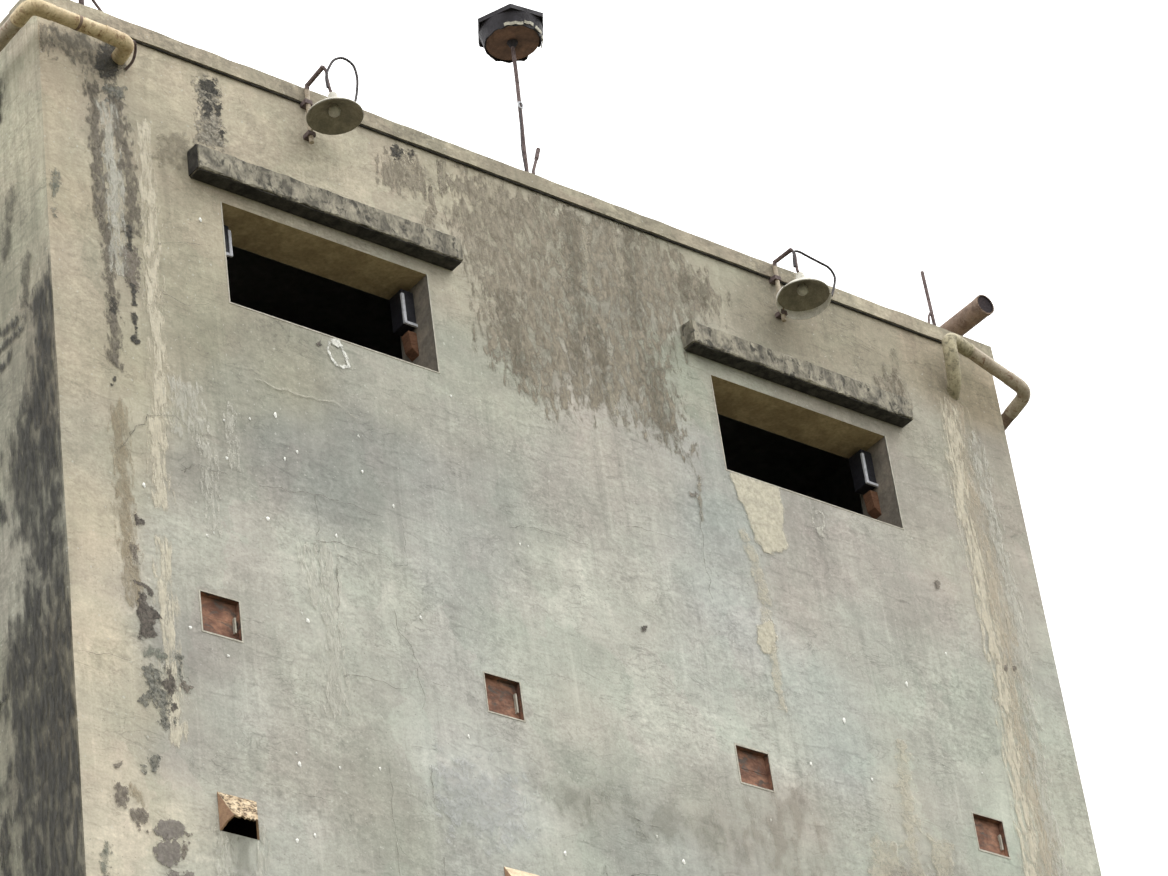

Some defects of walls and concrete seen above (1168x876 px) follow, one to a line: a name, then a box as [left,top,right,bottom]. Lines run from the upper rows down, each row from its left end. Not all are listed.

leakage [40,24,199,508]
leakage [375,144,730,462]
leakage [0,252,84,876]
leakage [111,399,143,607]
leakage [153,536,188,747]